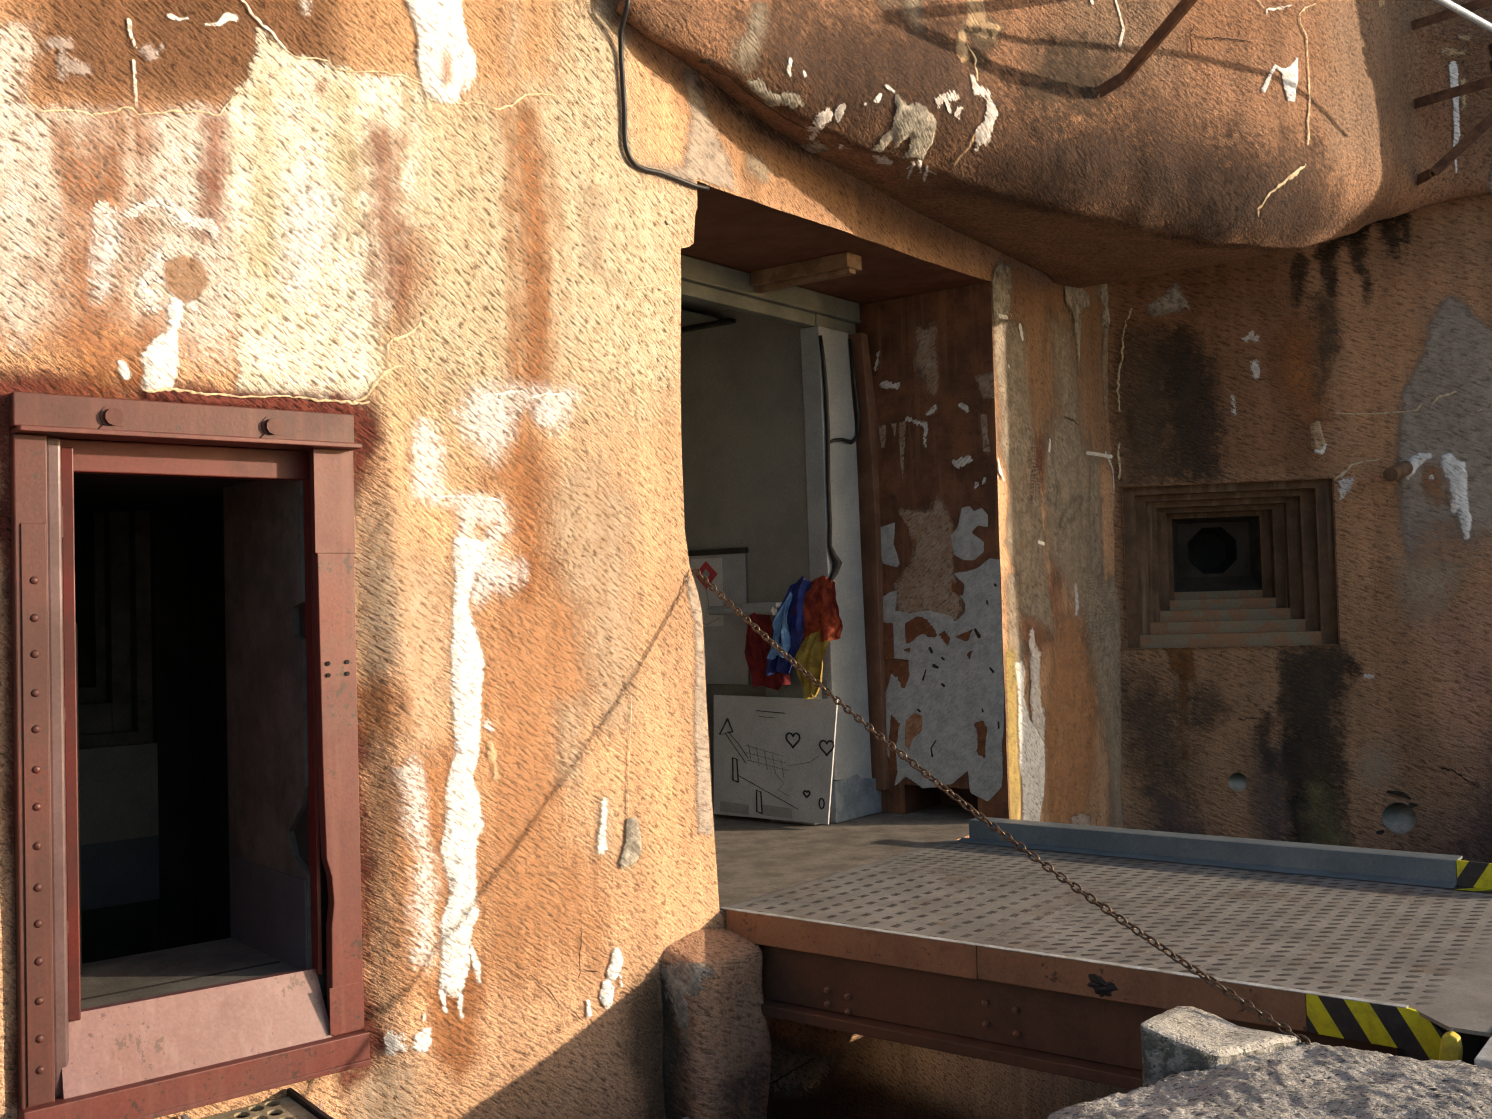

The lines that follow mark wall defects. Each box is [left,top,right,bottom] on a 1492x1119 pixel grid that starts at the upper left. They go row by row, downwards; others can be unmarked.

corrosion [389,105,600,1079]
leakage [0,0,1414,461]
peeling [874,351,900,390]
peeling [878,326,939,478]
peeling [880,497,1004,801]
peeling [952,372,994,469]
leakage [993,284,1228,835]
leakage [1250,644,1382,847]